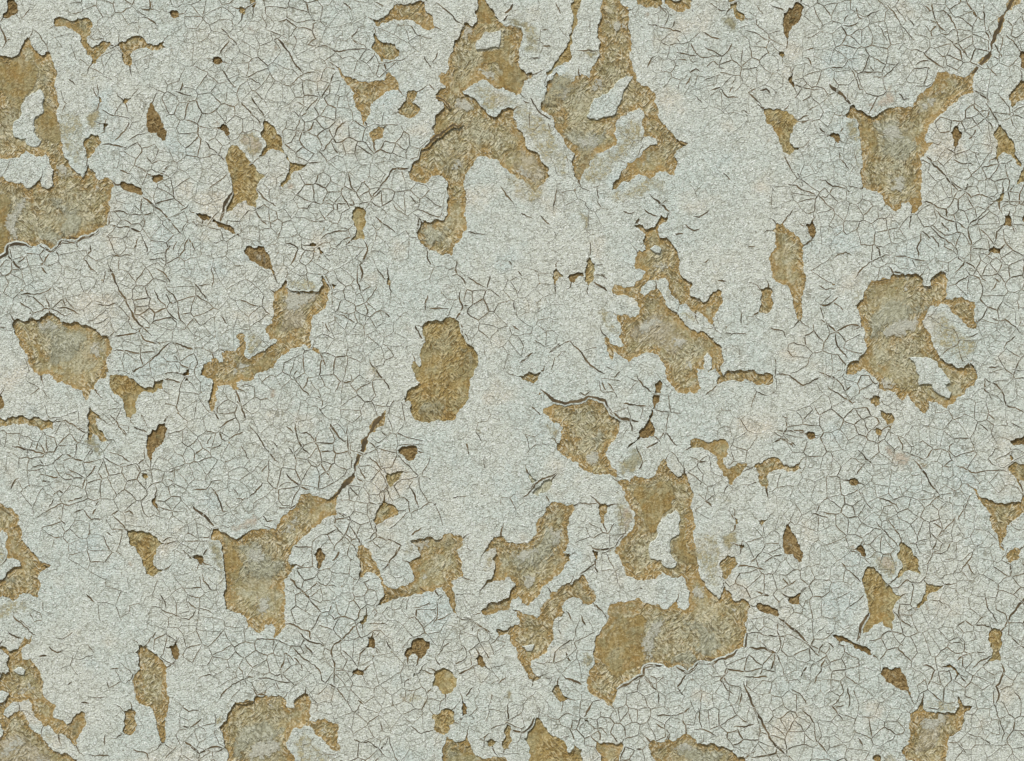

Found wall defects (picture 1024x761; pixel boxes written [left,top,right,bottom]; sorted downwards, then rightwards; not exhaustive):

peeling [0,0,172,254]
crack [0,121,227,373]
crack [168,358,390,523]
crack [261,1,463,332]
peeling [0,92,808,717]
peeling [327,0,694,265]
peeling [747,0,1024,265]
crack [773,129,1024,754]
peeling [835,263,980,489]
crack [804,0,1018,101]
peeling [0,494,89,761]
crack [561,545,863,761]